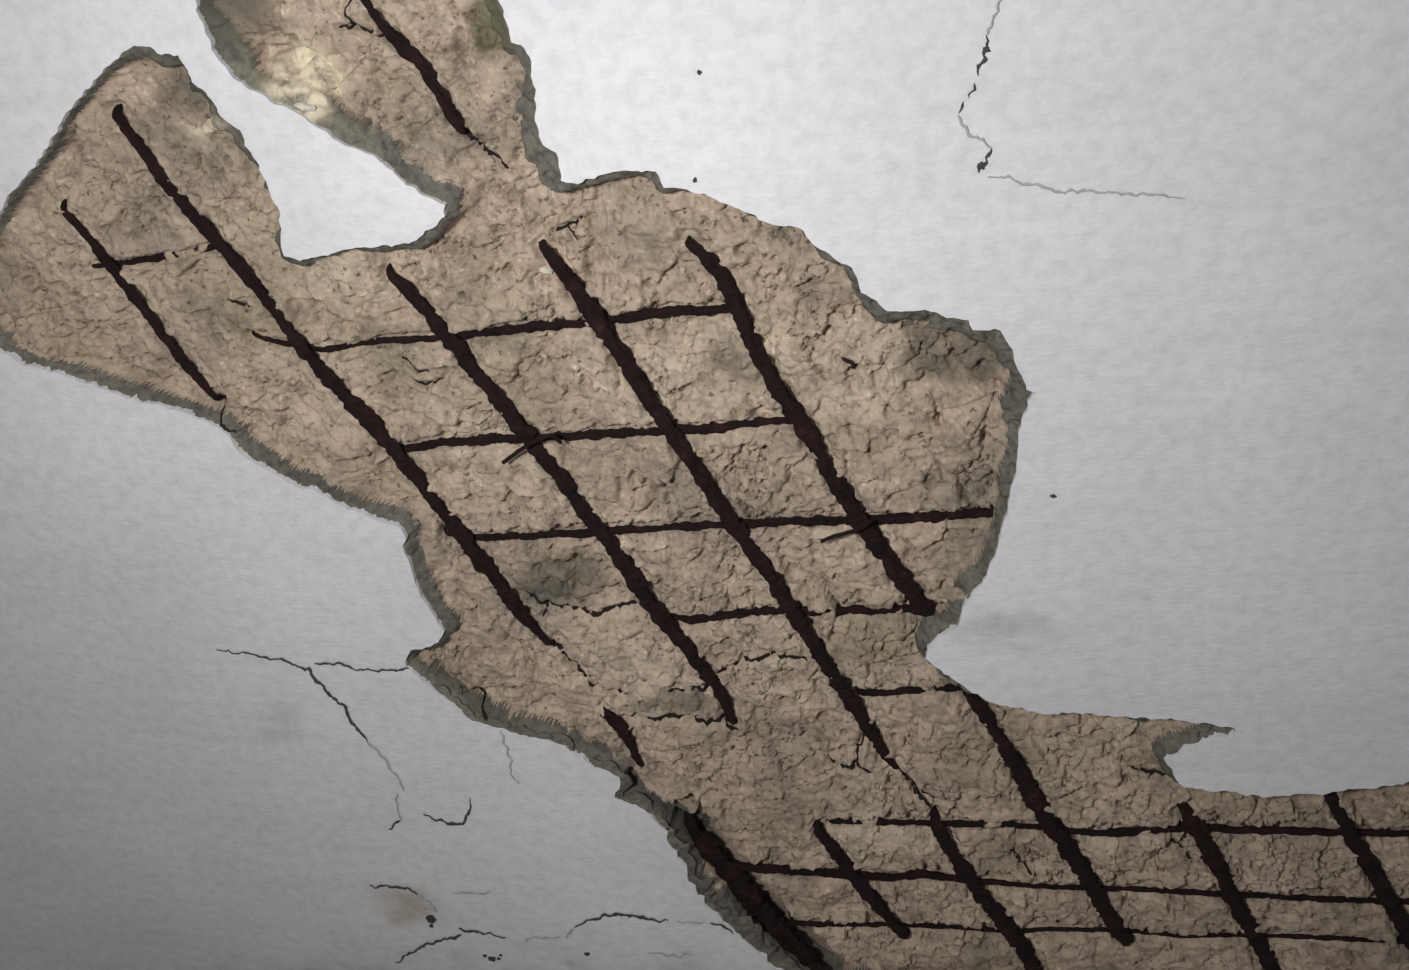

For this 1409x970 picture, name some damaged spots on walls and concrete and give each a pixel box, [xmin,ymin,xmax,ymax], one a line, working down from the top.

crack [958,0,1185,199]
spalling [0,0,1082,970]
crack [216,649,472,830]
crack [369,885,733,963]
spalling [962,689,1409,970]